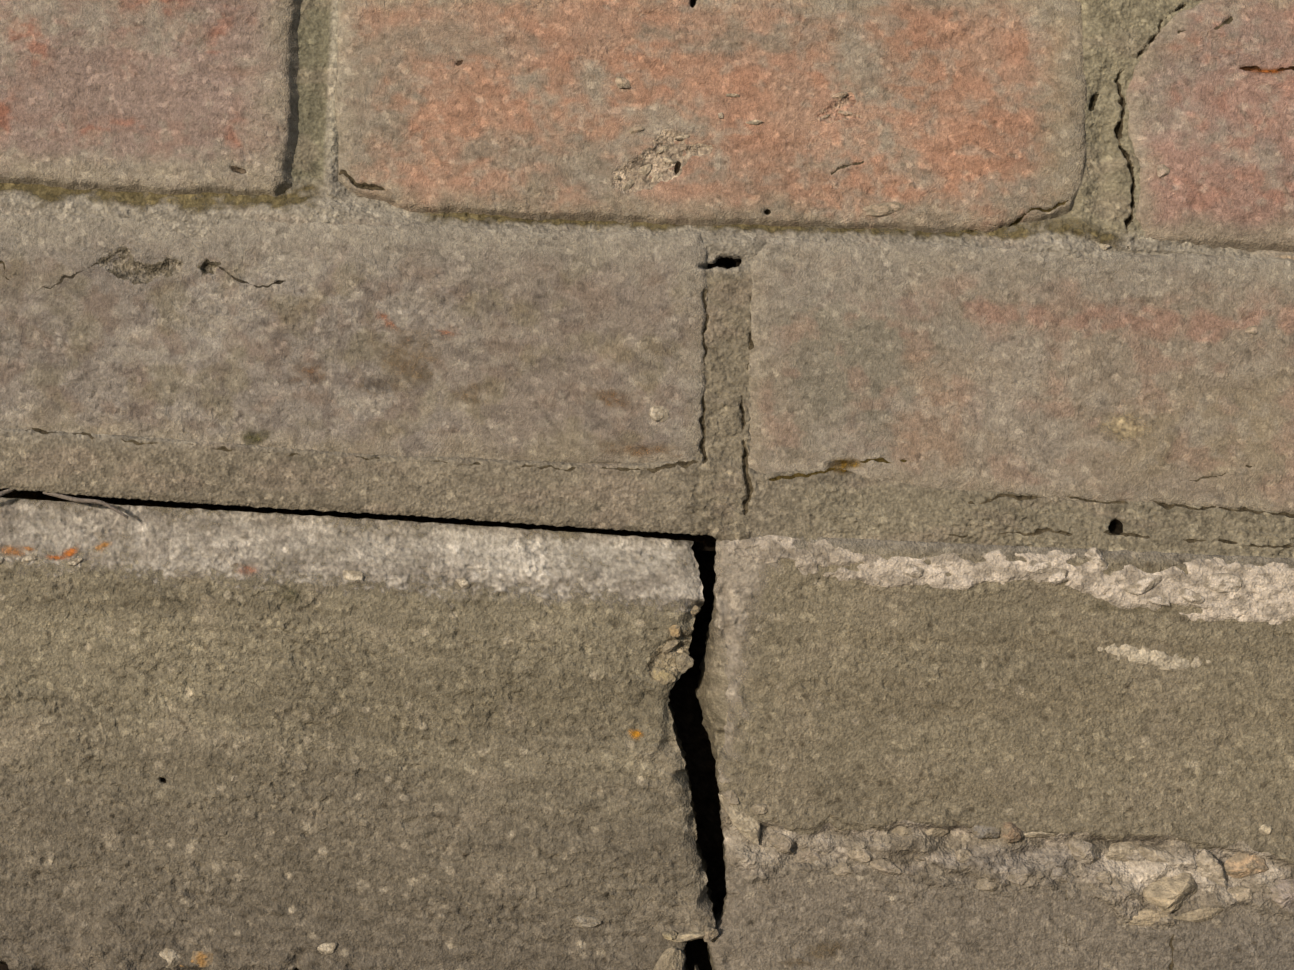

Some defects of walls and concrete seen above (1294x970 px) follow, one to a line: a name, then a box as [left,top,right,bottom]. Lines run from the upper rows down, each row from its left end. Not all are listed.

crack [1114,0,1233,249]
crack [25,428,157,445]
crack [192,444,299,456]
crack [517,289,709,473]
crack [739,296,907,515]
crack [0,488,727,970]
spalling [718,790,1294,931]
flaking render [159,948,213,969]